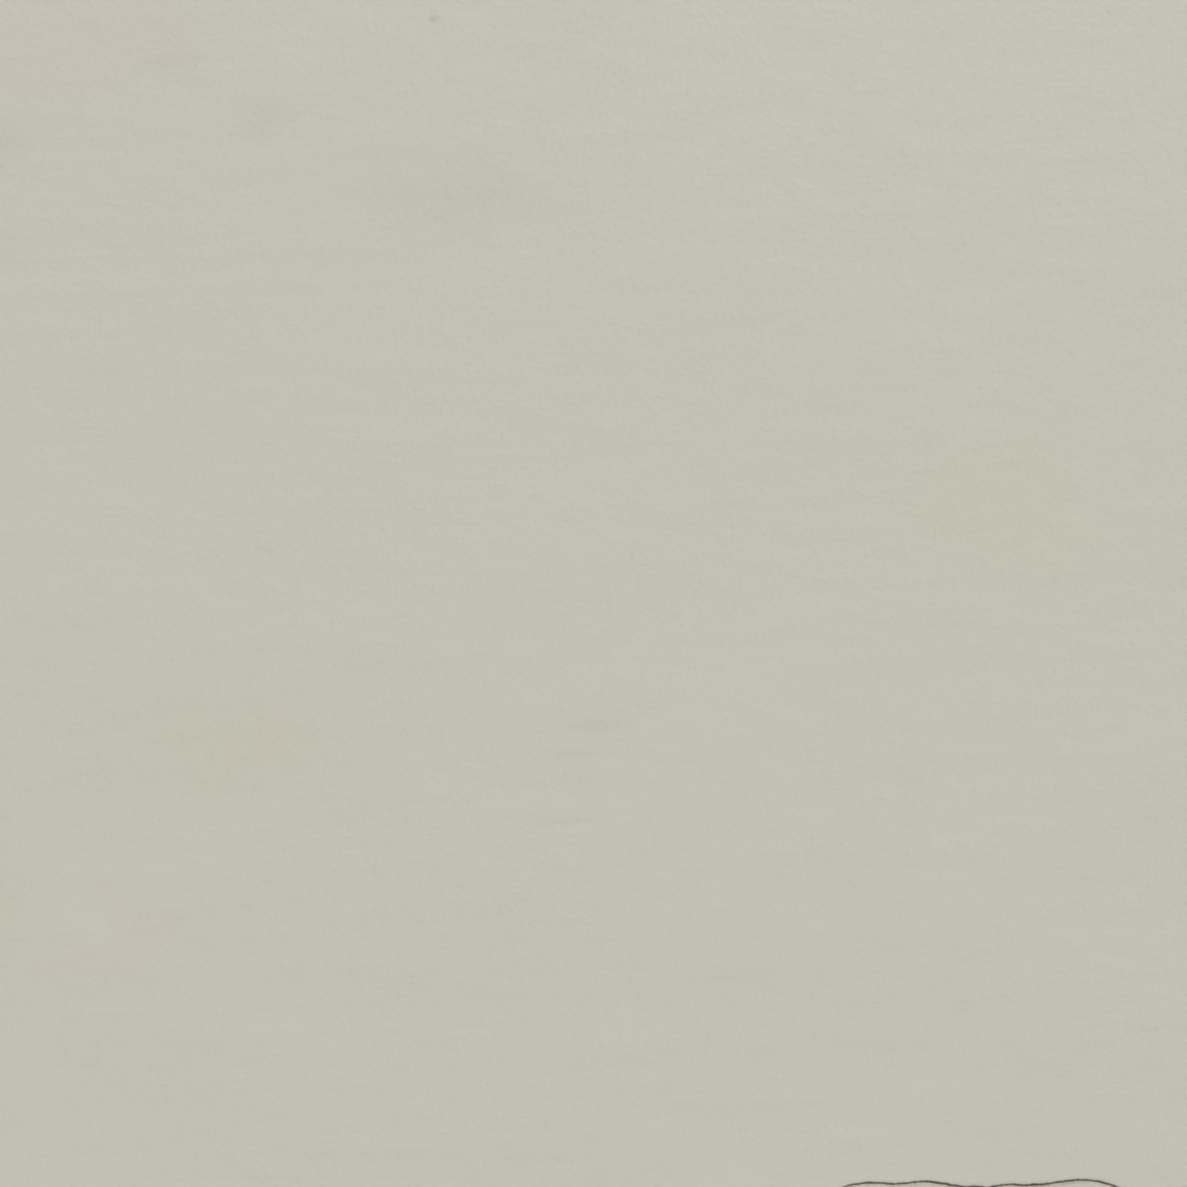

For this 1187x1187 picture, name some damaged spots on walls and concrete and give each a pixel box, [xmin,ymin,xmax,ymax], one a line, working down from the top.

crack [838,1176,1125,1187]